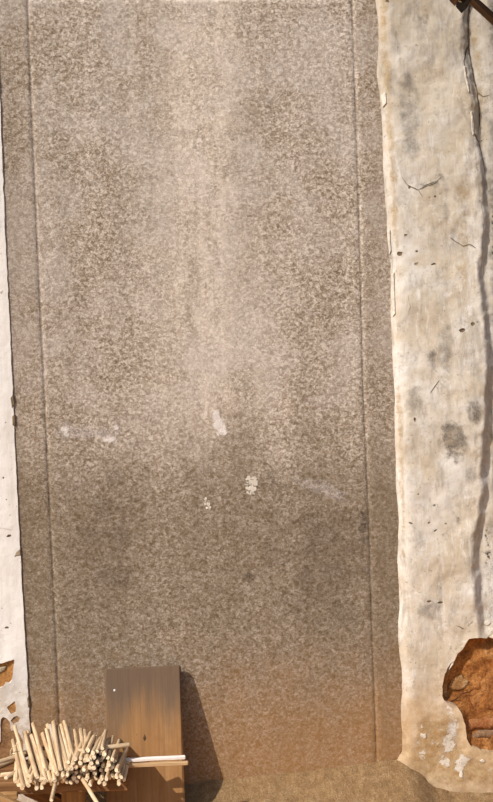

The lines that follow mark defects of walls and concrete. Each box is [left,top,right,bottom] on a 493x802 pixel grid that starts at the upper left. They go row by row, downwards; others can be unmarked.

crack [464,4,488,171]
leakage [444,425,465,462]
spalling [0,660,14,687]
spalling [414,632,493,782]